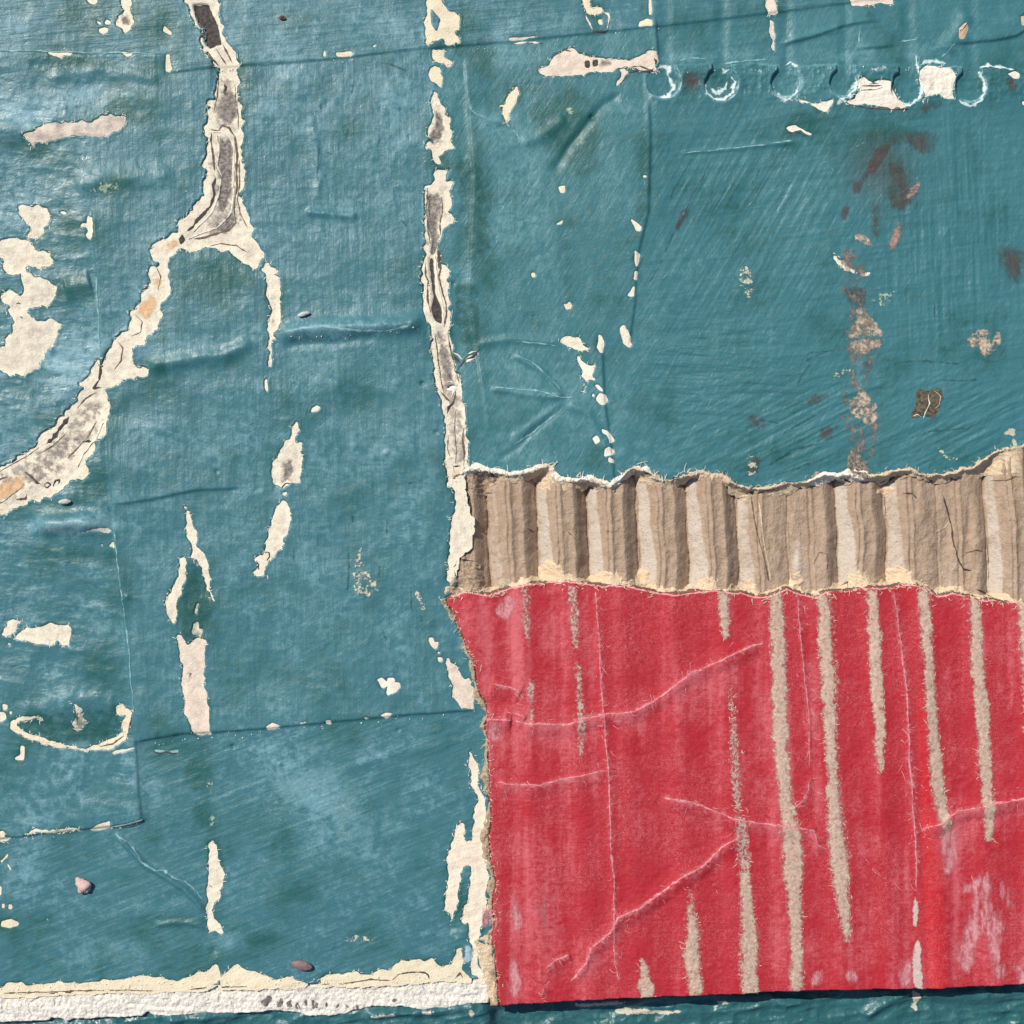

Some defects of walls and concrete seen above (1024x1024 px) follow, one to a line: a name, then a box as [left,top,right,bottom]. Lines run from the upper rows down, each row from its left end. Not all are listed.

peeling [97,0,134,34]
peeling [423,0,461,87]
peeling [538,46,659,85]
peeling [846,63,957,113]
peeling [21,111,126,151]
peeling [81,216,93,239]
peeling [0,203,66,376]
peeling [253,422,303,579]
peeling [164,504,215,735]
peeling [0,701,133,760]
peeling [205,841,227,934]
peeling [217,948,472,991]